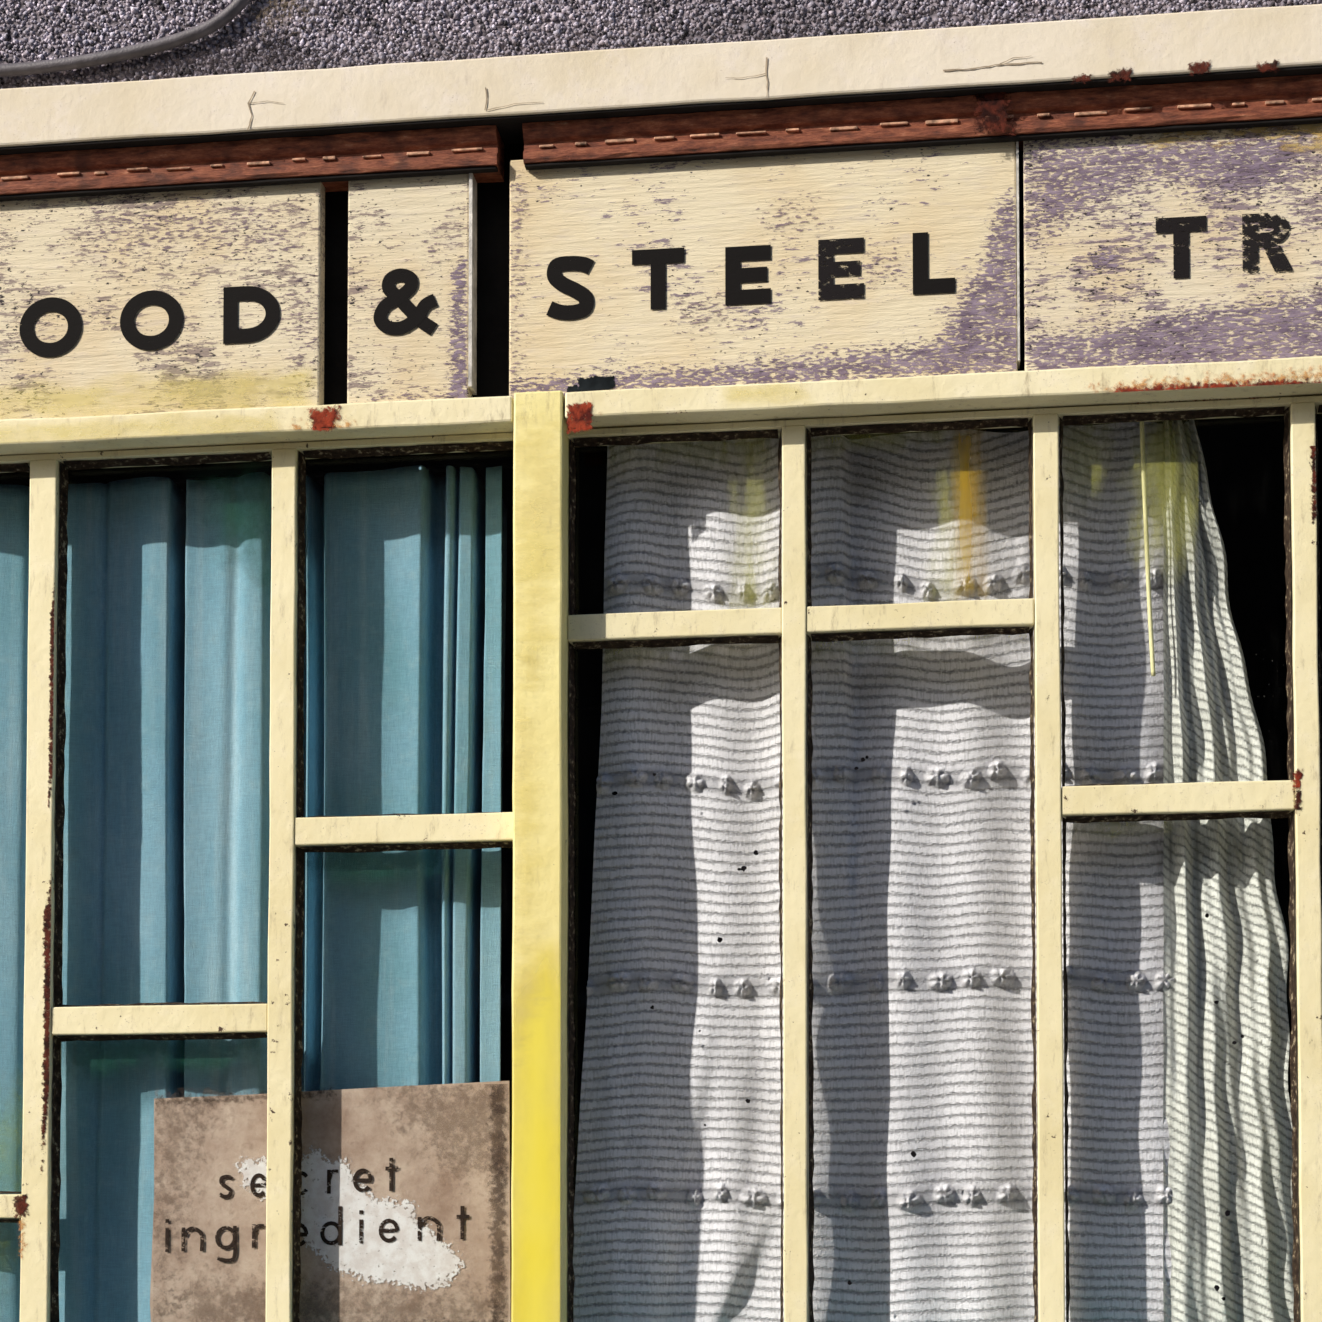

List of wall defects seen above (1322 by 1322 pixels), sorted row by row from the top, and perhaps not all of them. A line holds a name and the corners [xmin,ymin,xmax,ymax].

peeling [61,186,319,392]
corrosion [292,404,350,431]
corrosion [566,401,593,434]
peeling [509,92,1322,399]
corrosion [1093,368,1322,404]
corrosion [47,583,55,807]
corrosion [40,874,51,1171]
corrosion [12,1194,29,1258]